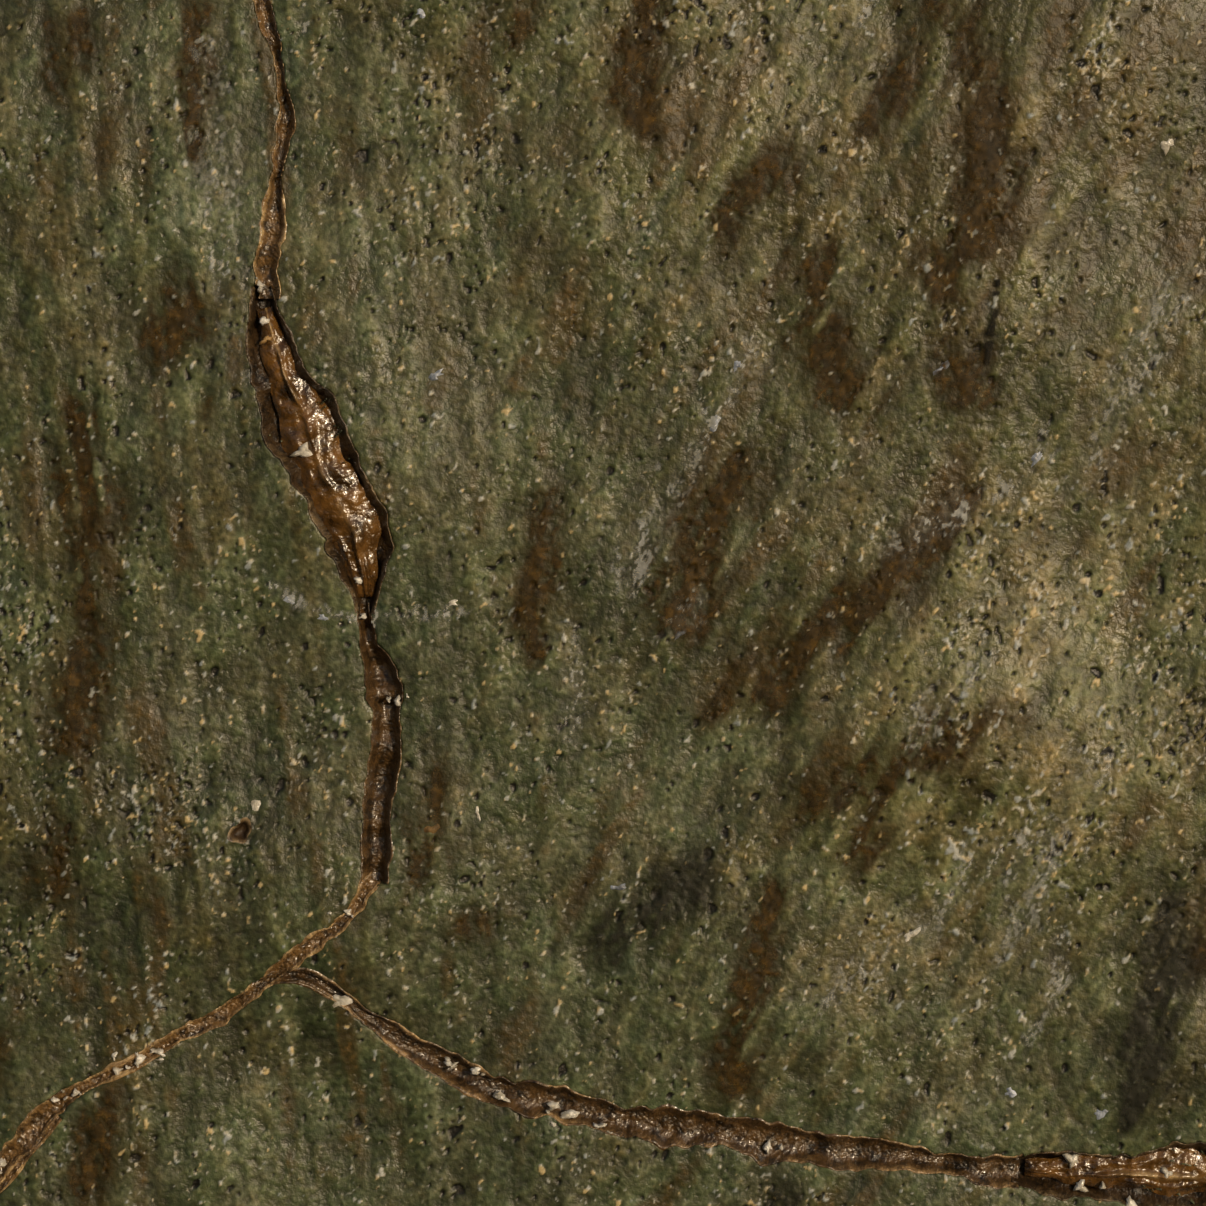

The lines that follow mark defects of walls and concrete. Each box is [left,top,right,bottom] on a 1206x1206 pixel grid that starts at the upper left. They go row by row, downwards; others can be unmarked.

crack [245,0,296,299]
crack [984,279,1000,365]
crack [0,603,1023,1193]